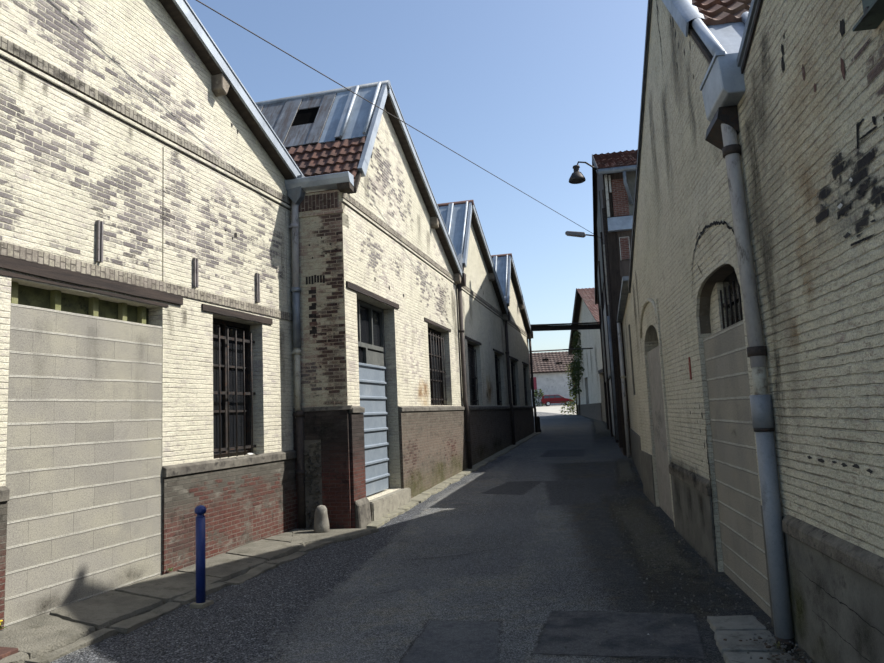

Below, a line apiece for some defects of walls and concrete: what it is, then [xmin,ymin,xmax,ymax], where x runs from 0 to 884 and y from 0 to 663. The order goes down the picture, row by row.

spalling [815,140,884,246]